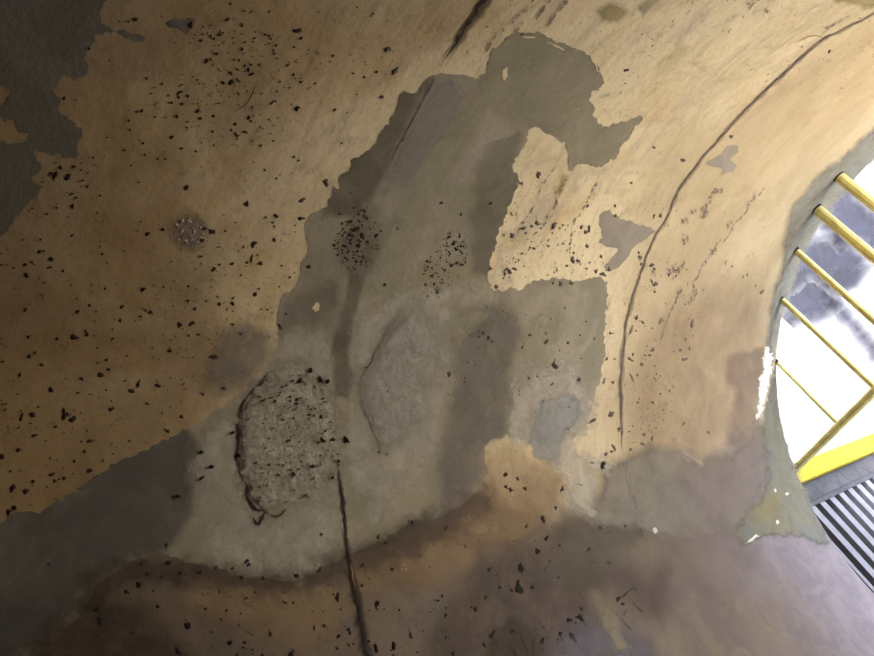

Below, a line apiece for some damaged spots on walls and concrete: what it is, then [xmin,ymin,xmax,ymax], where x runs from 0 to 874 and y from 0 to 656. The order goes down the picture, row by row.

peeling [0,0,146,237]
crack [394,0,492,155]
peeling [63,31,656,623]
crack [620,14,874,541]
leakage [201,559,274,656]
leakage [311,566,356,650]
crack [337,459,372,656]
leakage [498,563,534,594]
leakage [510,588,649,656]